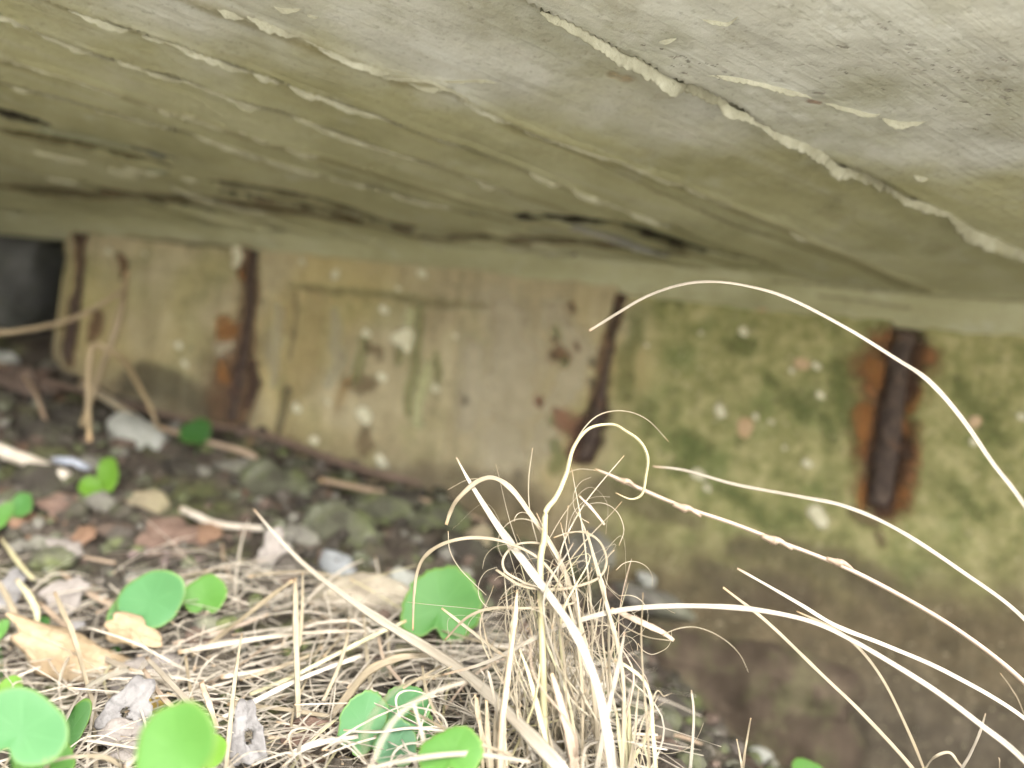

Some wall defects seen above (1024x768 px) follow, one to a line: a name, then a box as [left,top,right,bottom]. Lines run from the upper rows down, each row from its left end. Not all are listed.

peeling [658,38,926,130]
crack [85,180,416,230]
crack [512,212,738,257]
rust [206,246,263,426]
rust [535,294,627,465]
rust [849,327,941,547]